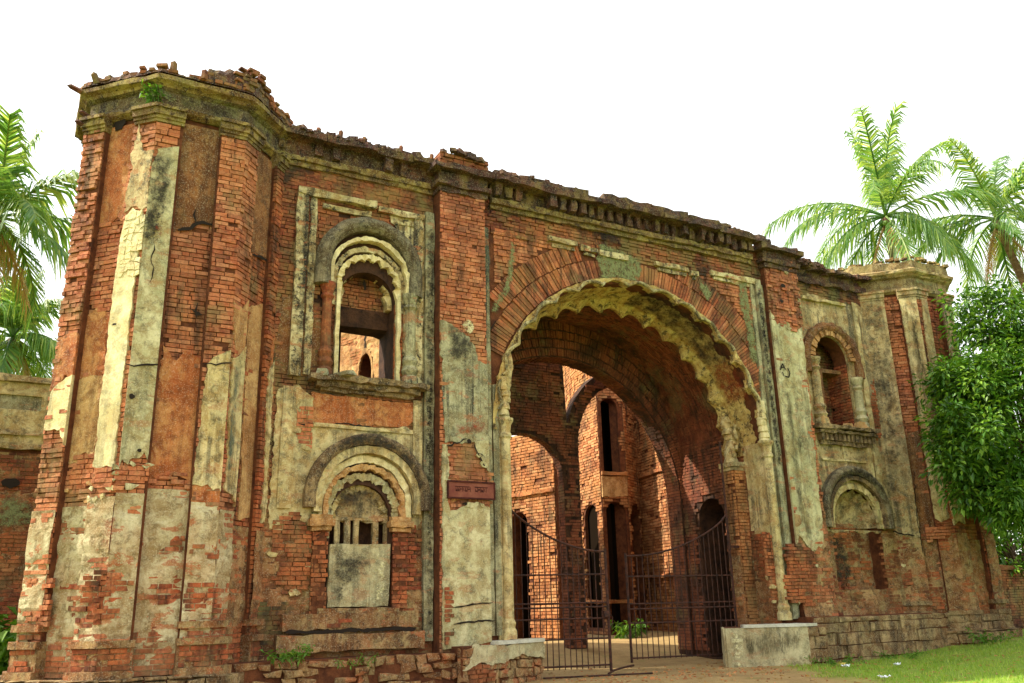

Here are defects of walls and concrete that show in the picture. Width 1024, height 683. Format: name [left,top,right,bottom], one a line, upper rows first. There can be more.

crack [178,209,212,231]
water stain [597,244,642,280]
peeling [768,271,804,332]
water stain [449,320,474,358]
water stain [334,229,434,627]
peeling [0,451,455,679]
peeling [729,514,1006,625]